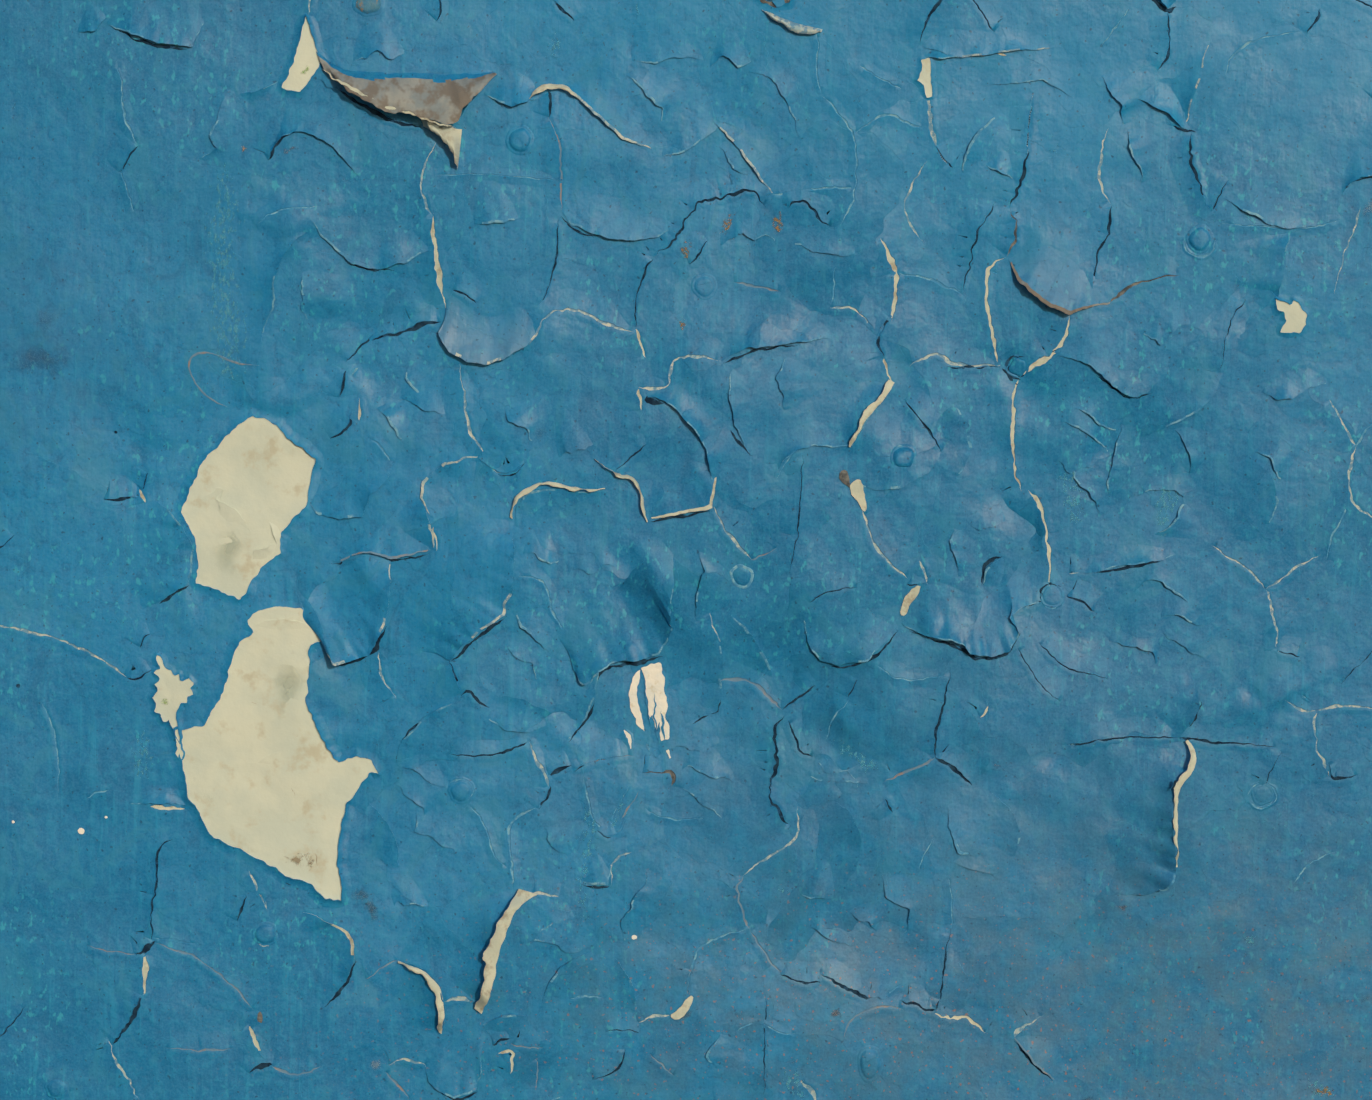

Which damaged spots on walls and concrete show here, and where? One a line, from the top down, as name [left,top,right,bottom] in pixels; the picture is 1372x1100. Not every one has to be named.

peeling [240,13,779,245]
peeling [793,222,855,256]
peeling [1224,184,1318,338]
crack [318,31,1372,787]
crack [0,609,153,687]
peeling [125,272,831,1007]
crack [434,658,704,890]
crack [697,612,983,878]
crack [86,826,324,1100]
peeling [389,874,596,1034]
crack [570,968,696,1086]
crack [732,875,994,1100]